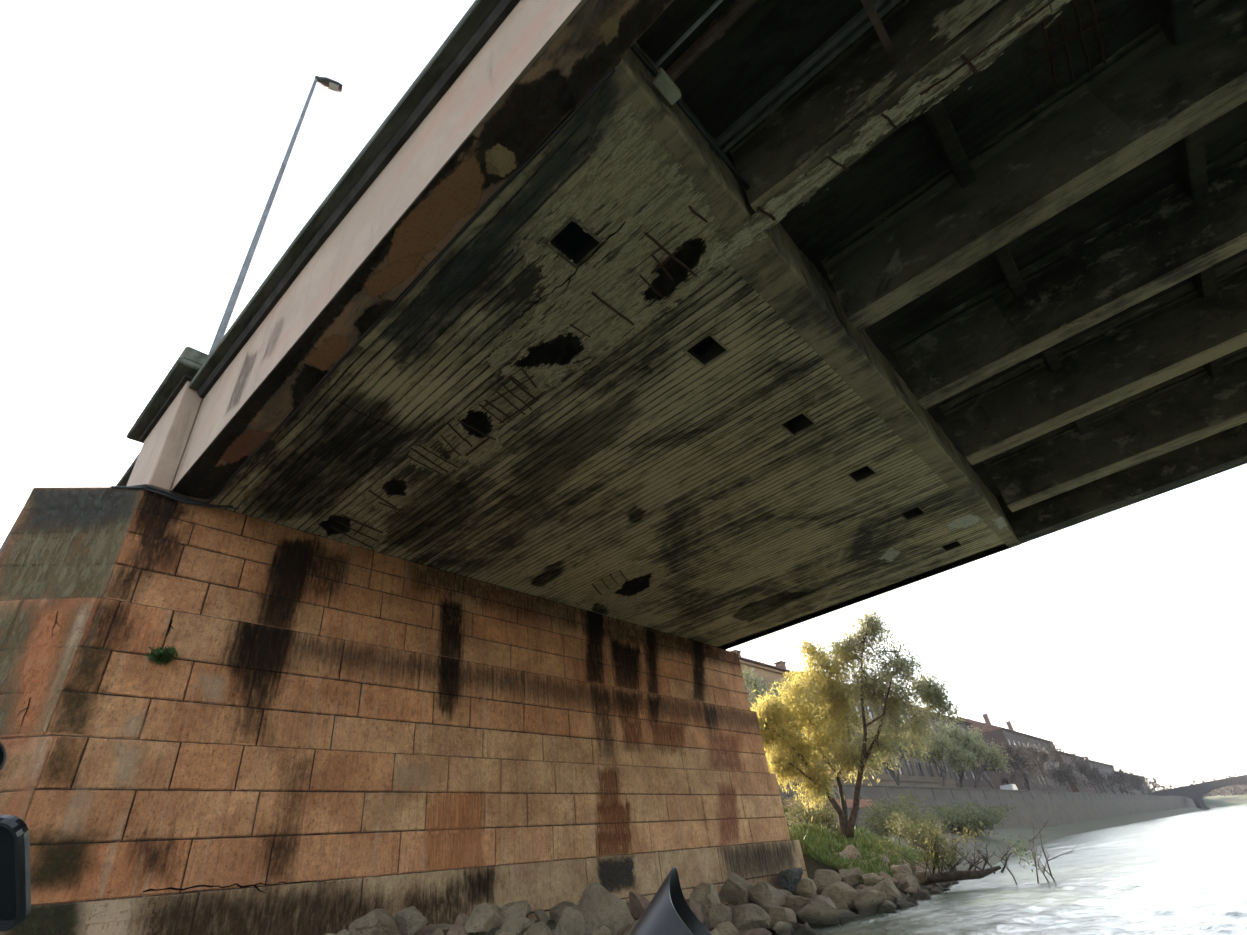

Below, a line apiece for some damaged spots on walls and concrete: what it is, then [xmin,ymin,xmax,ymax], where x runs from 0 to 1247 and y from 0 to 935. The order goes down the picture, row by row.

peeling [364,143,517,297]
spalling [401,0,1071,475]
peeling [303,334,349,371]
spalling [317,478,416,549]
peeling [946,514,1008,530]
spalling [588,565,669,617]
damp [229,538,759,752]
damp [598,856,635,892]
damp [724,841,795,877]